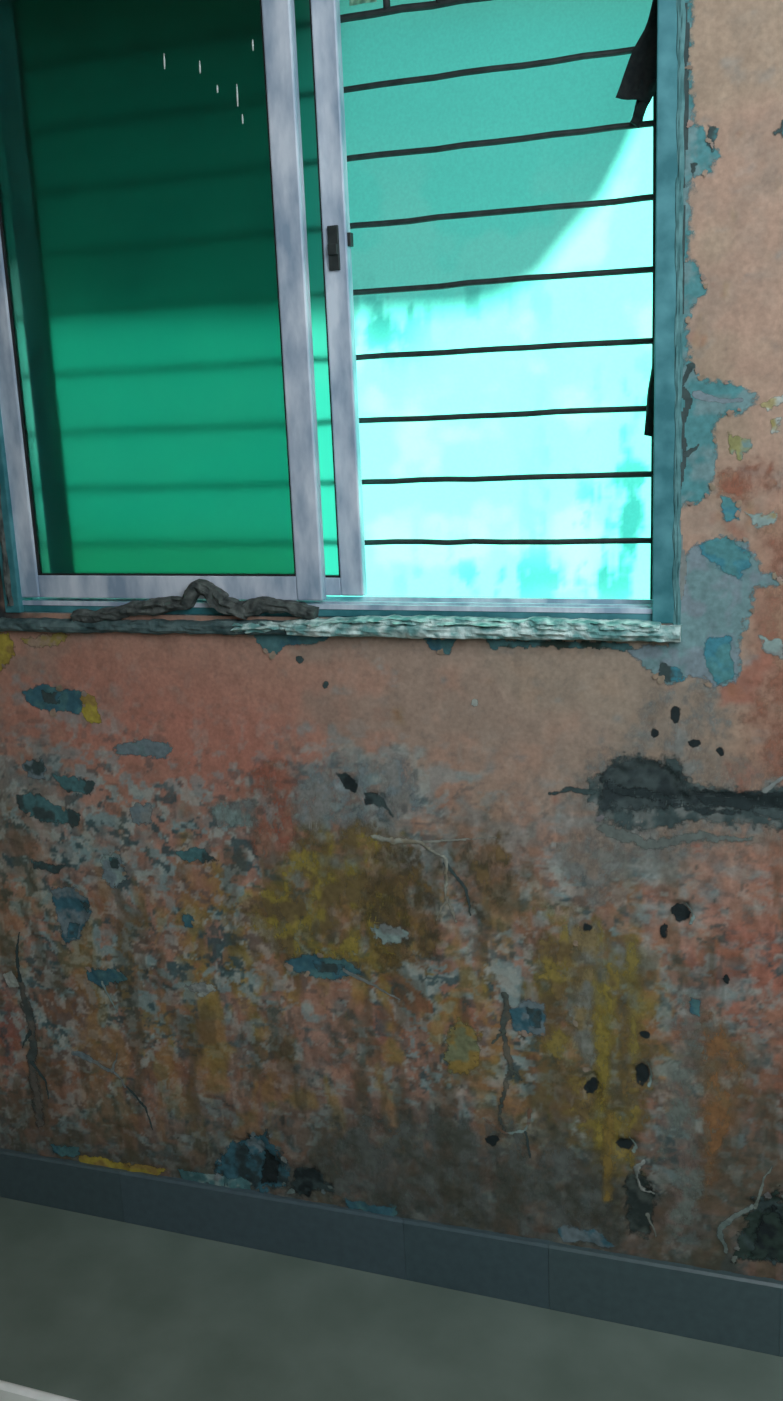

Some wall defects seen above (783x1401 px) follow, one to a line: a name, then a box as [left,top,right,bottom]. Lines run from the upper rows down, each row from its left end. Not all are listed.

peeling [486,0,783,688]
peeling [22,684,102,724]
peeling [114,738,173,759]
peeling [16,759,95,828]
peeling [175,847,219,864]
water stain [212,757,512,975]
peeling [30,859,92,945]
peeling [370,923,409,945]
peeling [85,966,127,1015]
peeling [284,953,400,1000]
spalling [214,1129,334,1197]
spalling [716,1165,783,1265]